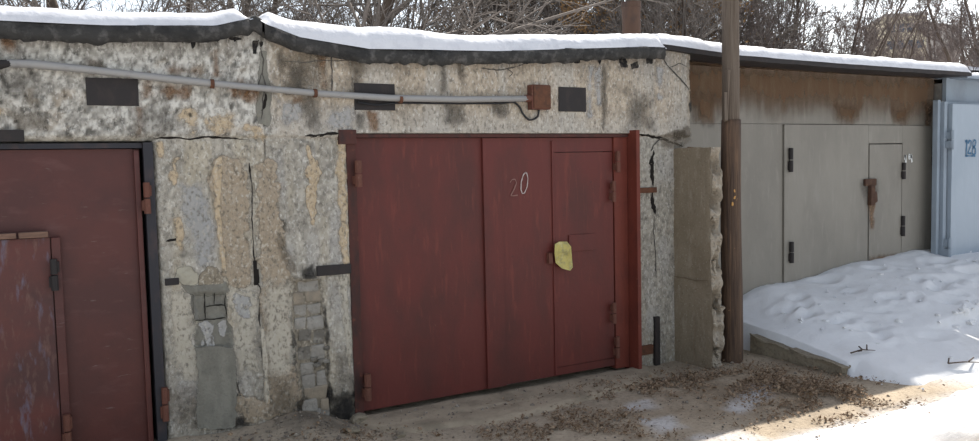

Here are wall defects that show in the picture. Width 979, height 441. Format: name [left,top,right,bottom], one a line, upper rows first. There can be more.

crack [156,48,350,140]
leakage [170,291,199,380]
spalling [190,293,234,348]
crack [236,163,265,398]
spalling [287,265,333,416]
crack [640,134,706,281]